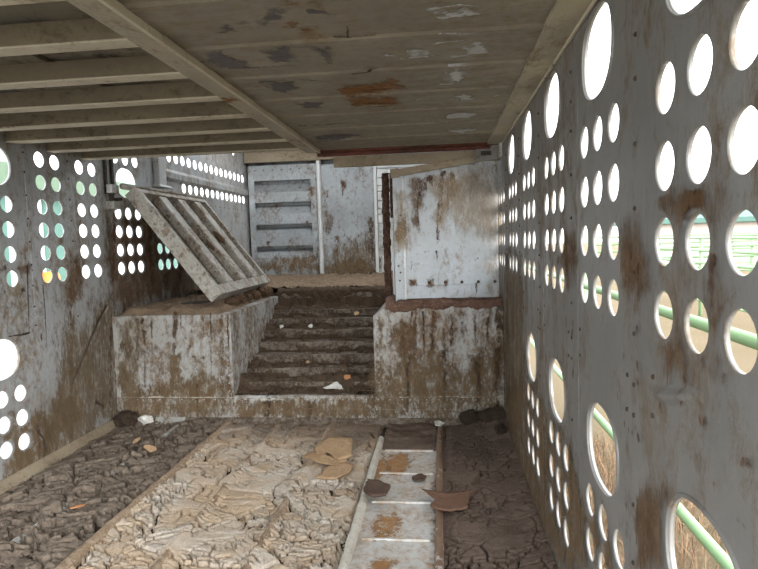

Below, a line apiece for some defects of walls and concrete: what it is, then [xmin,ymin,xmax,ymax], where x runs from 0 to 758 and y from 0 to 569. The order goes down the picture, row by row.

rust [338,81,404,107]
rust [395,171,455,252]
rust [659,186,712,234]
rust [618,220,648,306]
damp [210,313,229,374]
rust [390,309,464,359]
rust [486,306,503,364]
rust [374,453,412,479]
rust [371,513,402,541]
rust [635,485,667,569]